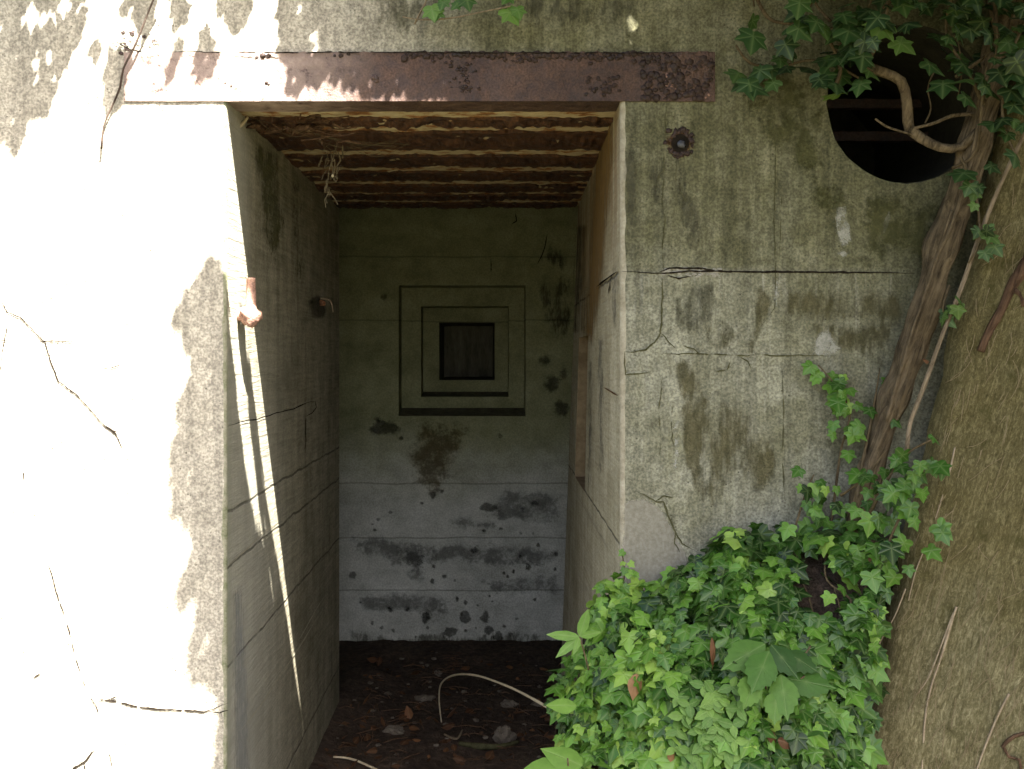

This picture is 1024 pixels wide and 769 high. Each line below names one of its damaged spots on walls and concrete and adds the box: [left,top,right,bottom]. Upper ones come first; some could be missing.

spalling [112,30,161,55]
leakage [626,151,635,223]
leakage [676,285,713,330]
crack [596,104,910,495]
crack [0,298,132,469]
crack [227,401,317,454]
leakage [674,362,774,494]
crack [638,492,694,552]
crack [47,562,228,714]